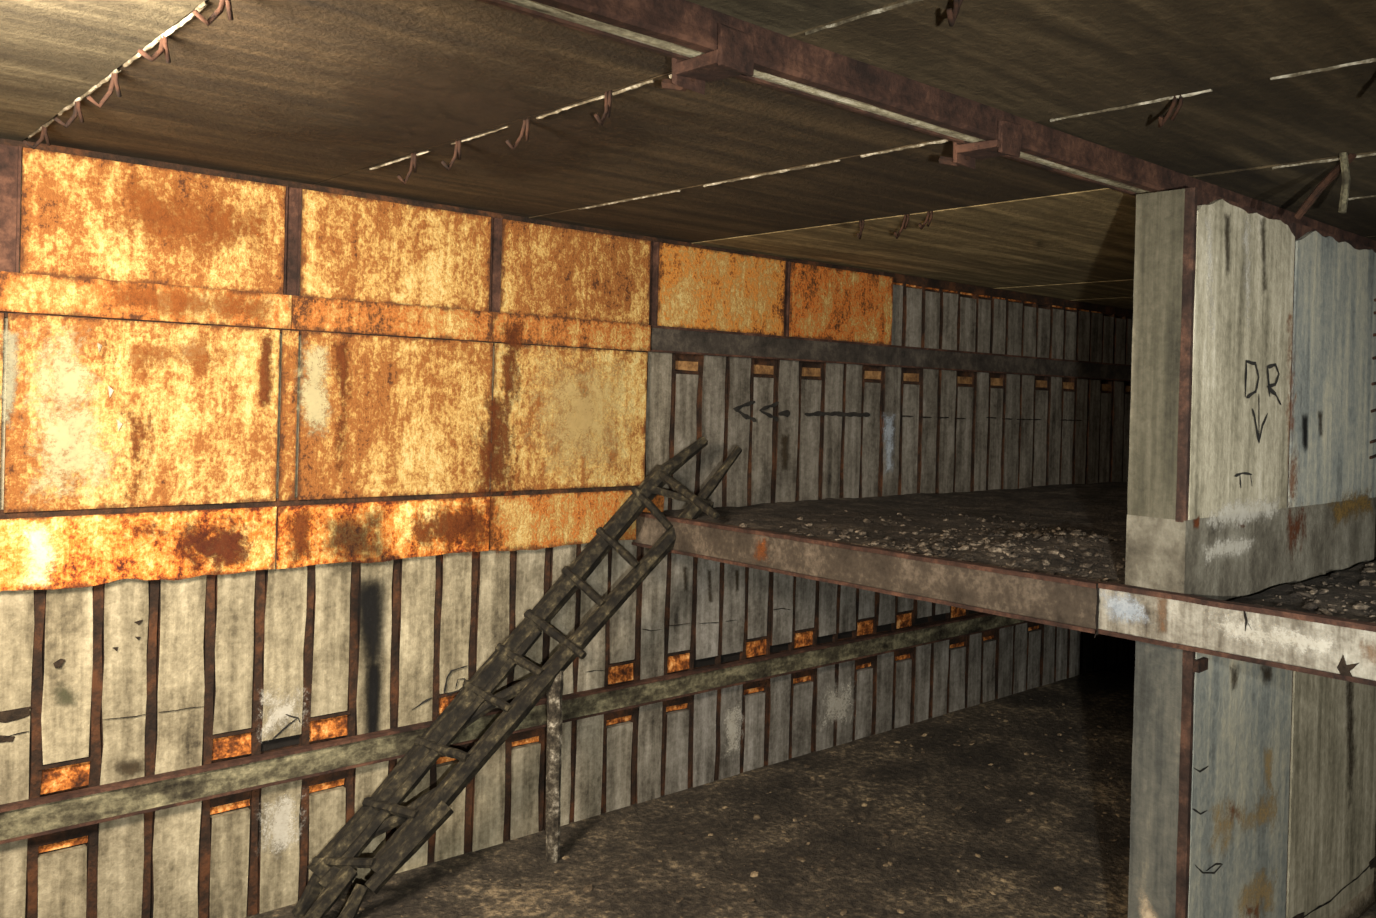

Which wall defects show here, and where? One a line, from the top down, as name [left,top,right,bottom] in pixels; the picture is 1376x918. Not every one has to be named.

rust [0,147,893,591]
damp [355,581,385,733]